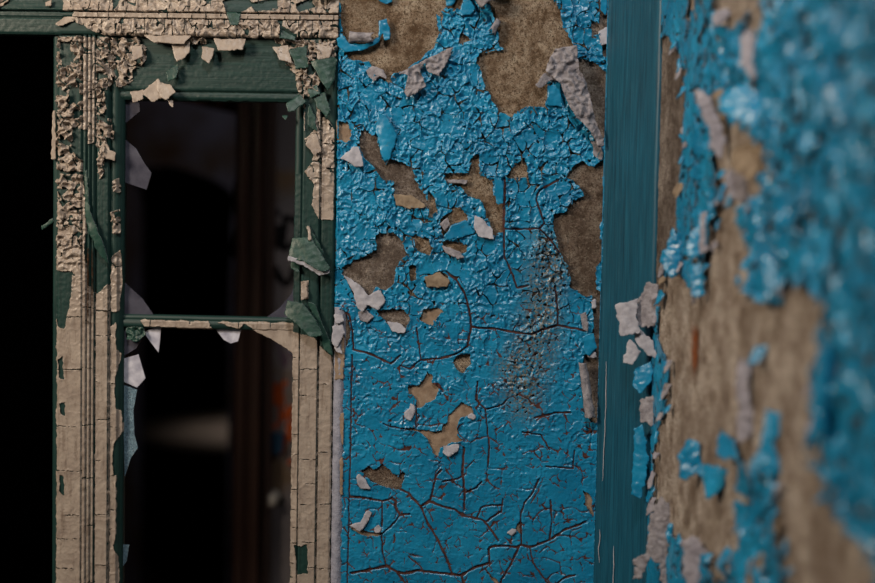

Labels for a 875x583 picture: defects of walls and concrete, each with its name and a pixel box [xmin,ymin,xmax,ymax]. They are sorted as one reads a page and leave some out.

peeling [0,0,79,68]
peeling [55,270,74,329]
peeling [72,127,116,294]
peeling [123,0,608,583]
crack [502,179,560,289]
peeling [615,0,875,583]
crack [345,271,586,583]